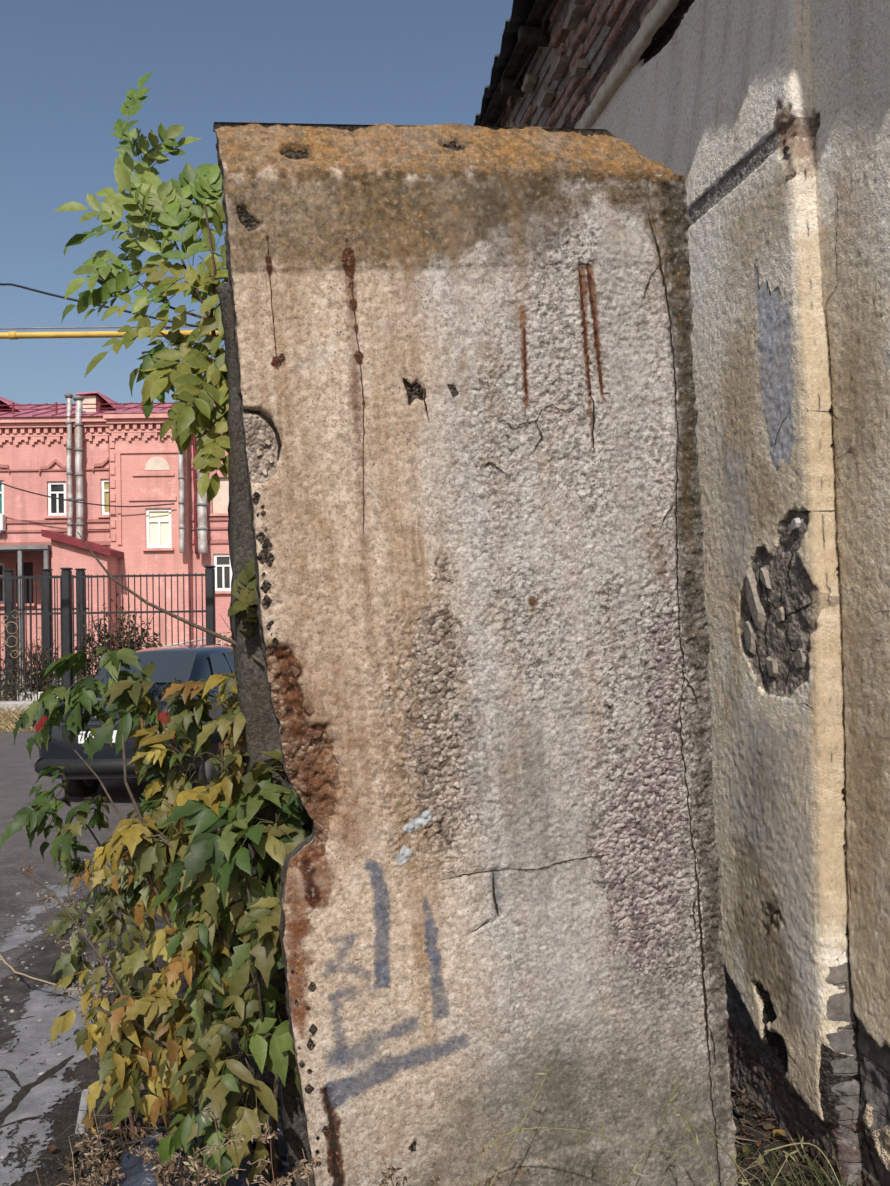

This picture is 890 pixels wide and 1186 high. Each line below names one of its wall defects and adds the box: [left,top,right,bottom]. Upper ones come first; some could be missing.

flaking render [689,101,820,227]
rust [266,235,285,369]
rust [342,238,365,533]
spalling [403,378,429,421]
rust [520,306,528,406]
rust [578,263,610,450]
spalling [243,410,340,869]
rust [276,647,326,742]
flaking render [738,510,841,698]
rust [285,846,330,1037]
crack [442,854,609,934]
flaking render [724,963,890,1186]